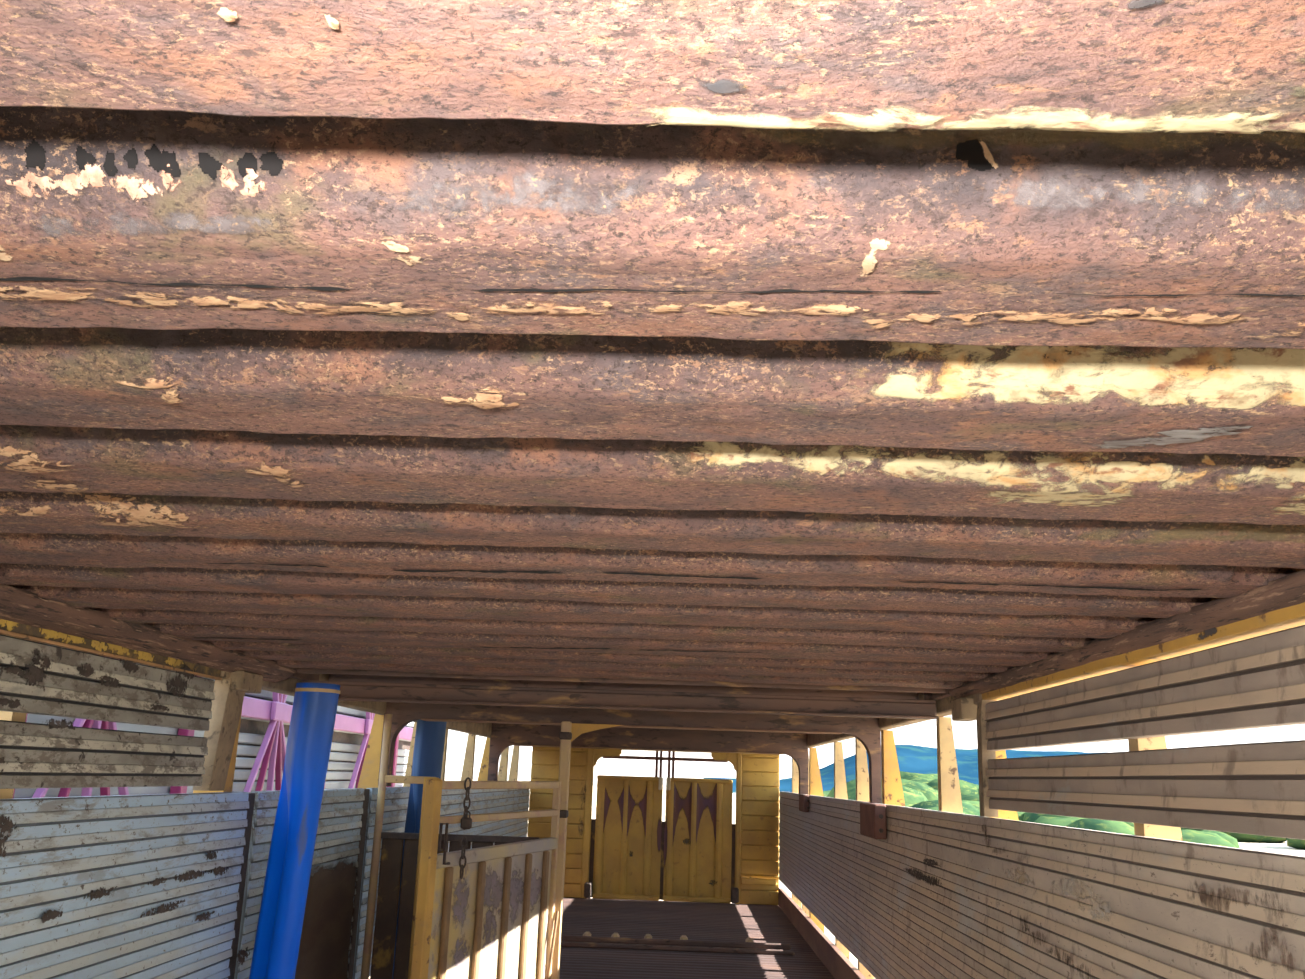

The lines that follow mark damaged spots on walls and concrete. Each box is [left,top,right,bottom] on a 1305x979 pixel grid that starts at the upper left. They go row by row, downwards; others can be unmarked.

spalling [217,8,242,22]
peeling [651,107,1305,148]
corrosion [5,162,182,202]
corrosion [217,159,265,197]
crack [0,277,356,291]
corrosion [0,286,1246,329]
crack [472,287,941,295]
peeling [871,342,1305,409]
damp [1096,426,1253,449]
corrosion [0,442,208,528]
peeling [688,441,1305,543]
crack [396,568,561,576]